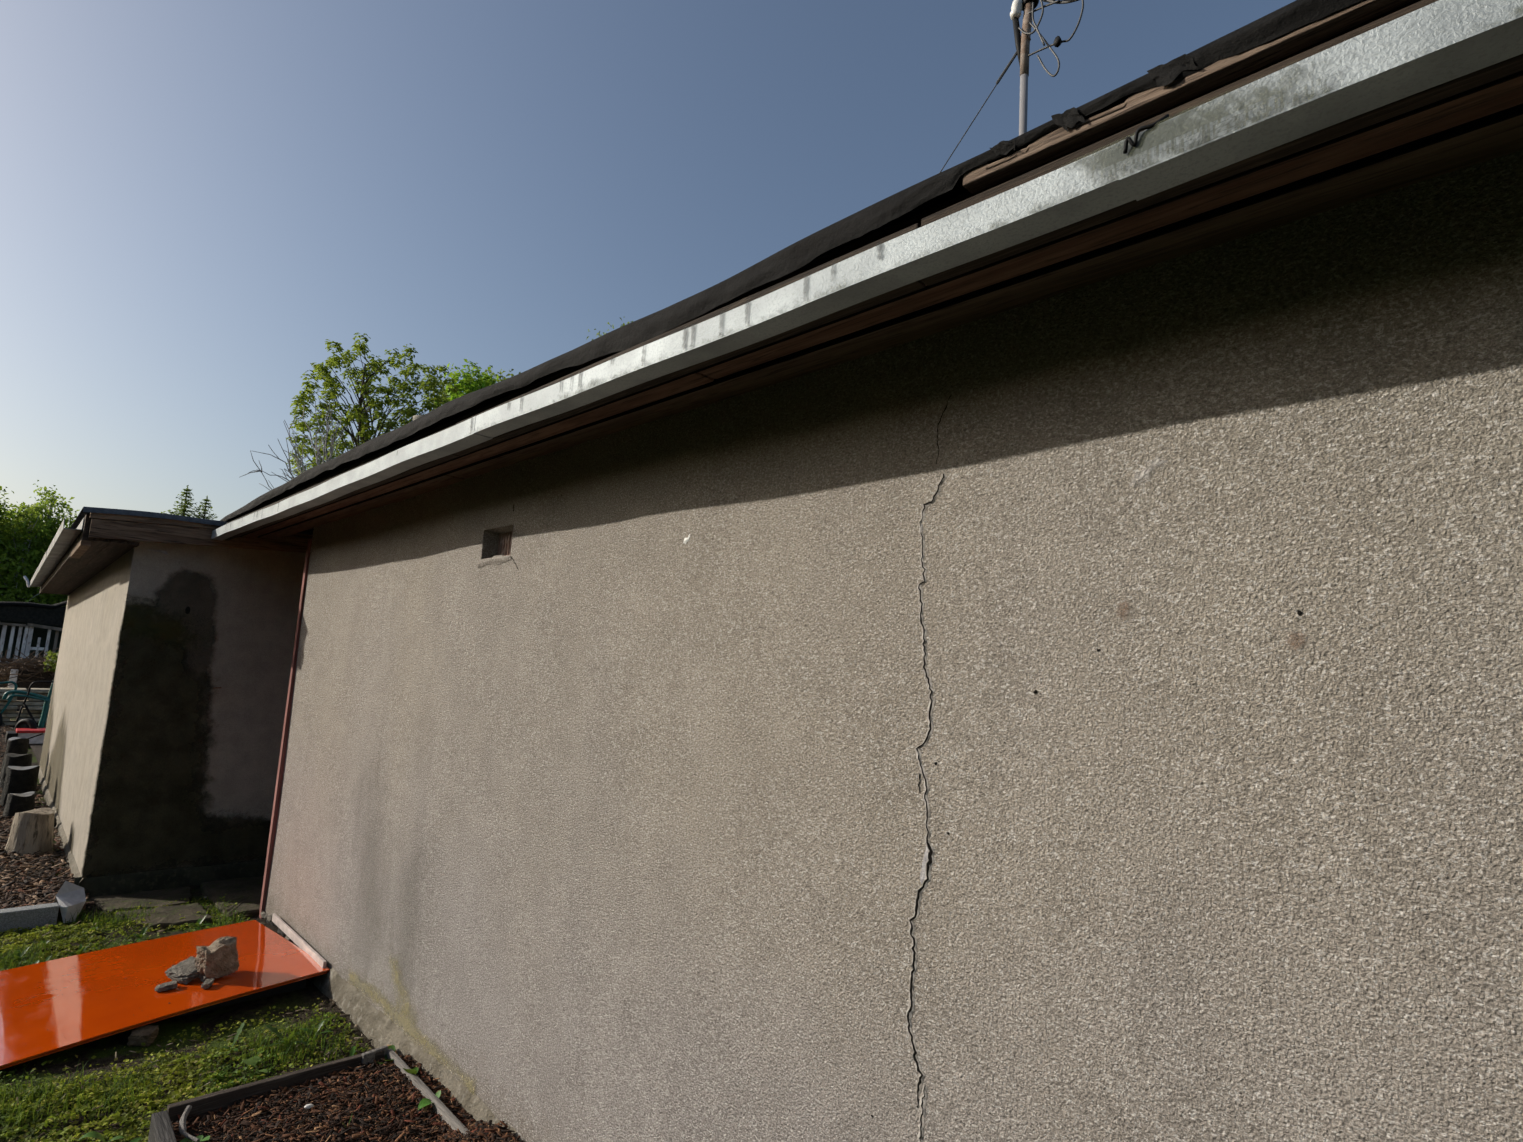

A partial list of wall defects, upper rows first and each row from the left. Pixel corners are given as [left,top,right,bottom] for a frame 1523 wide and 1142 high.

damp [68,570,271,878]
crack [906,395,951,1142]